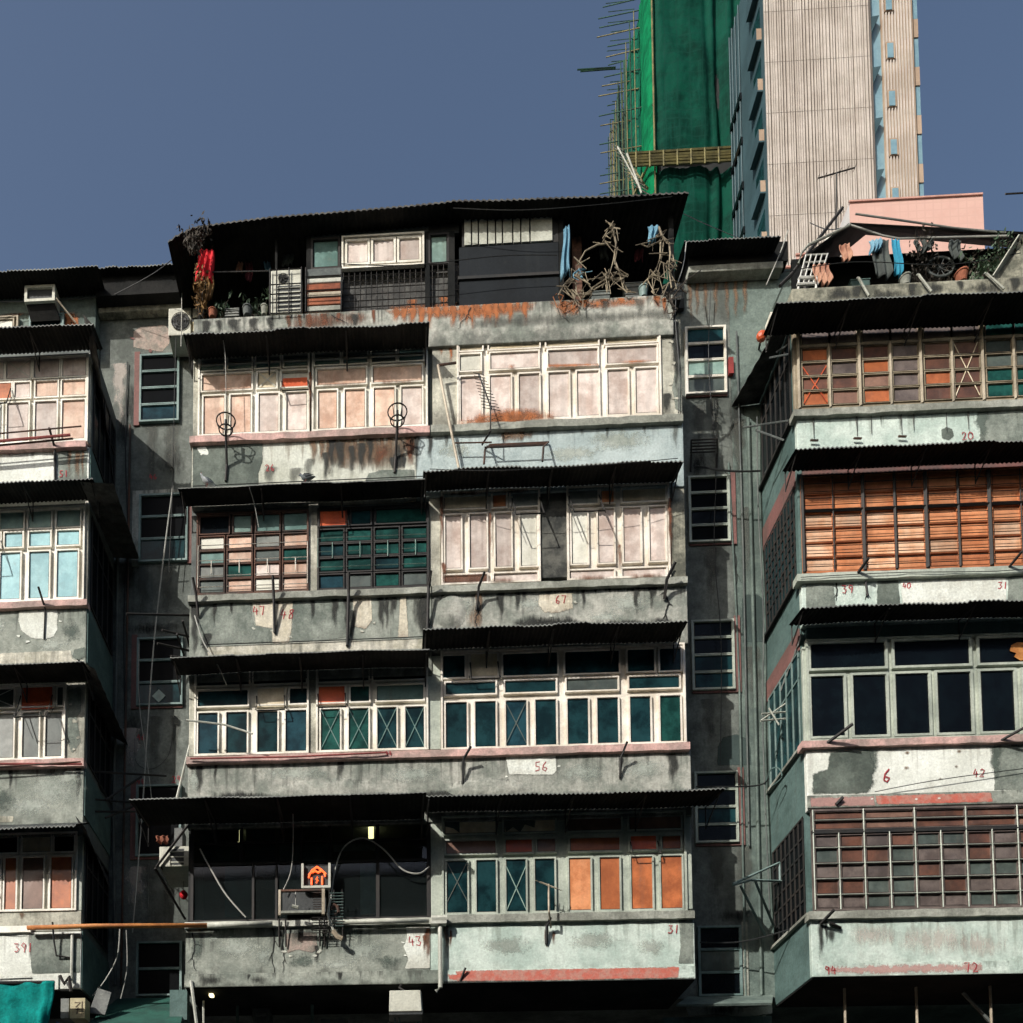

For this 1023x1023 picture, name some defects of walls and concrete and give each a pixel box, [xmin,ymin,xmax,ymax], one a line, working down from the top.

corrosion [286,310,375,328]
corrosion [393,297,530,323]
corrosion [558,298,635,314]
peeling [130,325,169,353]
corrosion [467,410,550,440]
peeling [0,610,83,664]
peeling [208,597,422,656]
water stain [332,599,355,637]
water stain [377,597,397,625]
water stain [497,592,576,626]
water stain [544,587,661,623]
water stain [0,768,81,815]